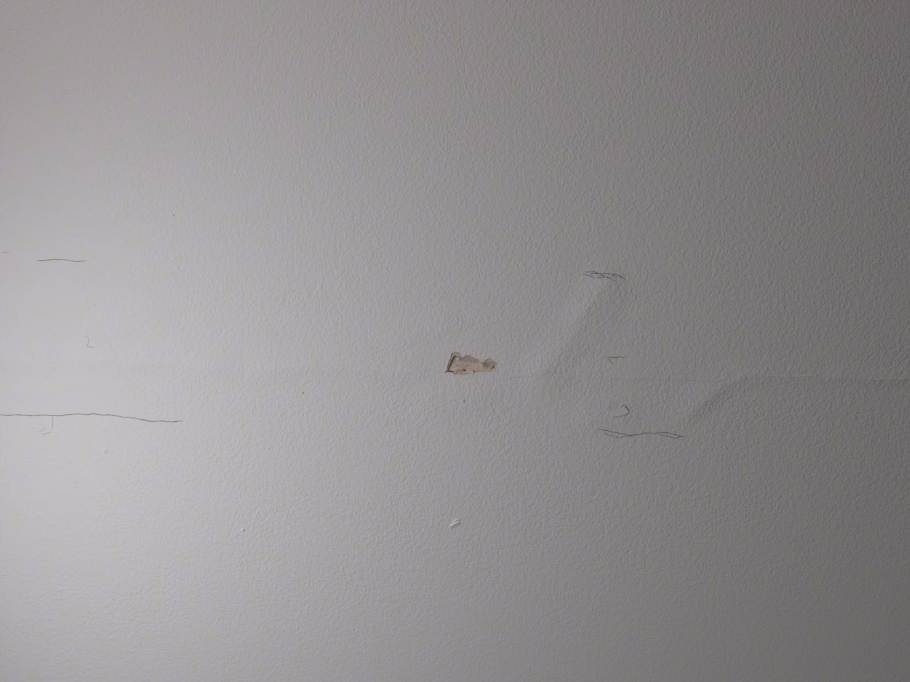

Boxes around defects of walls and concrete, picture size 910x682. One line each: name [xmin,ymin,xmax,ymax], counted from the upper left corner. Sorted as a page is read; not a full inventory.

crack [5,413,183,435]
crack [600,429,683,438]